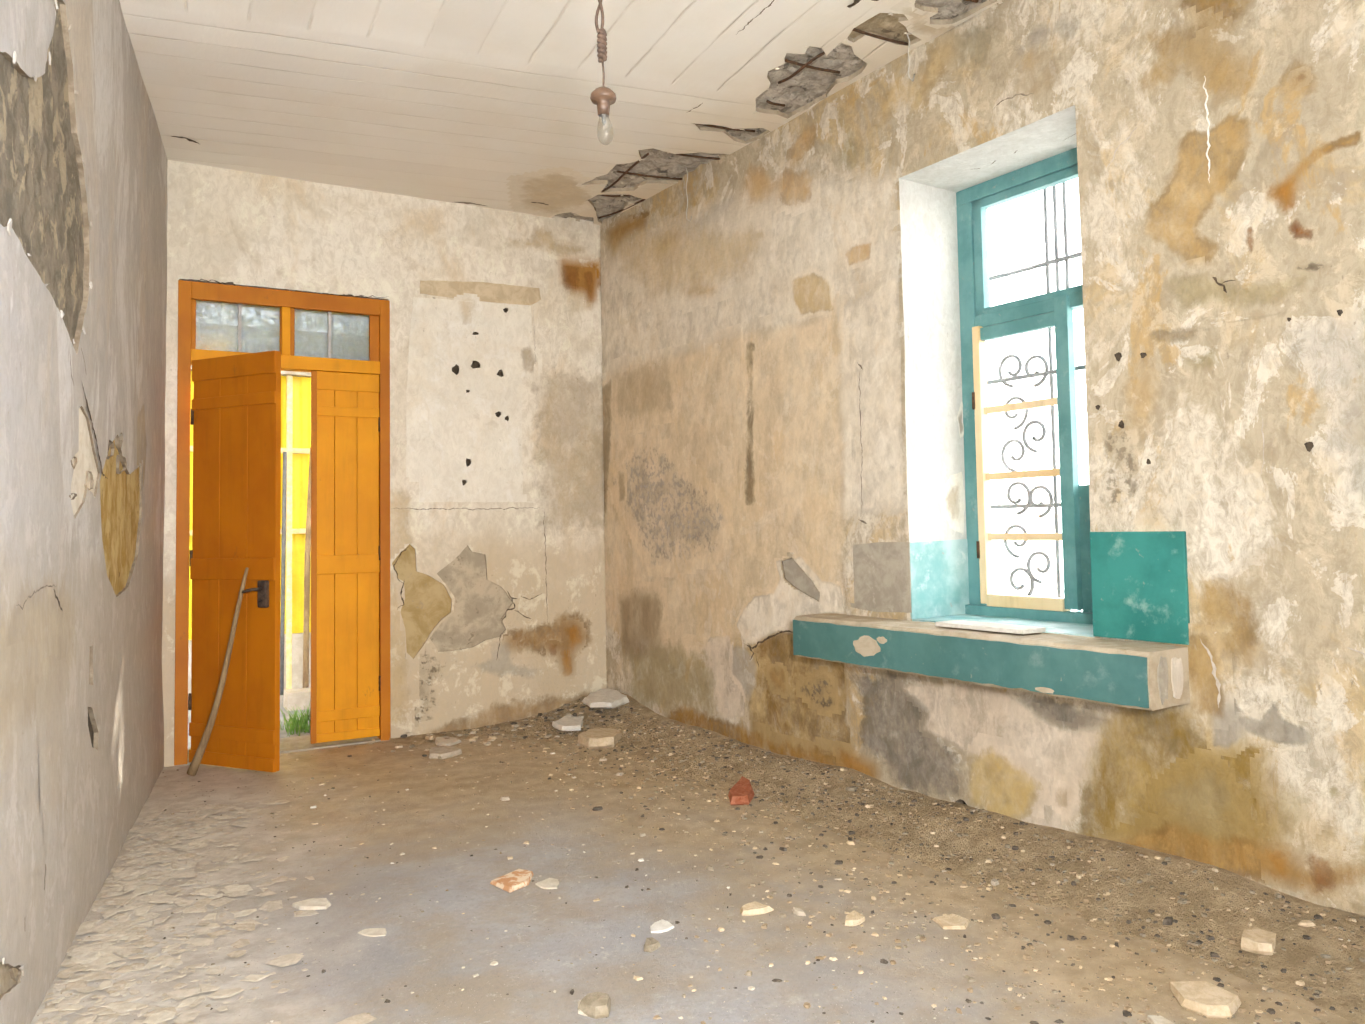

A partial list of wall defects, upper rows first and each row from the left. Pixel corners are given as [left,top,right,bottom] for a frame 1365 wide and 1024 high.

flaking render [0,0,93,344]
spalling [549,148,722,221]
damp [496,0,1070,319]
spalling [691,0,1003,141]
damp [1092,0,1365,530]
peeling [71,408,140,595]
peeling [392,544,513,658]
peeling [783,558,820,601]
damp [796,522,1365,851]